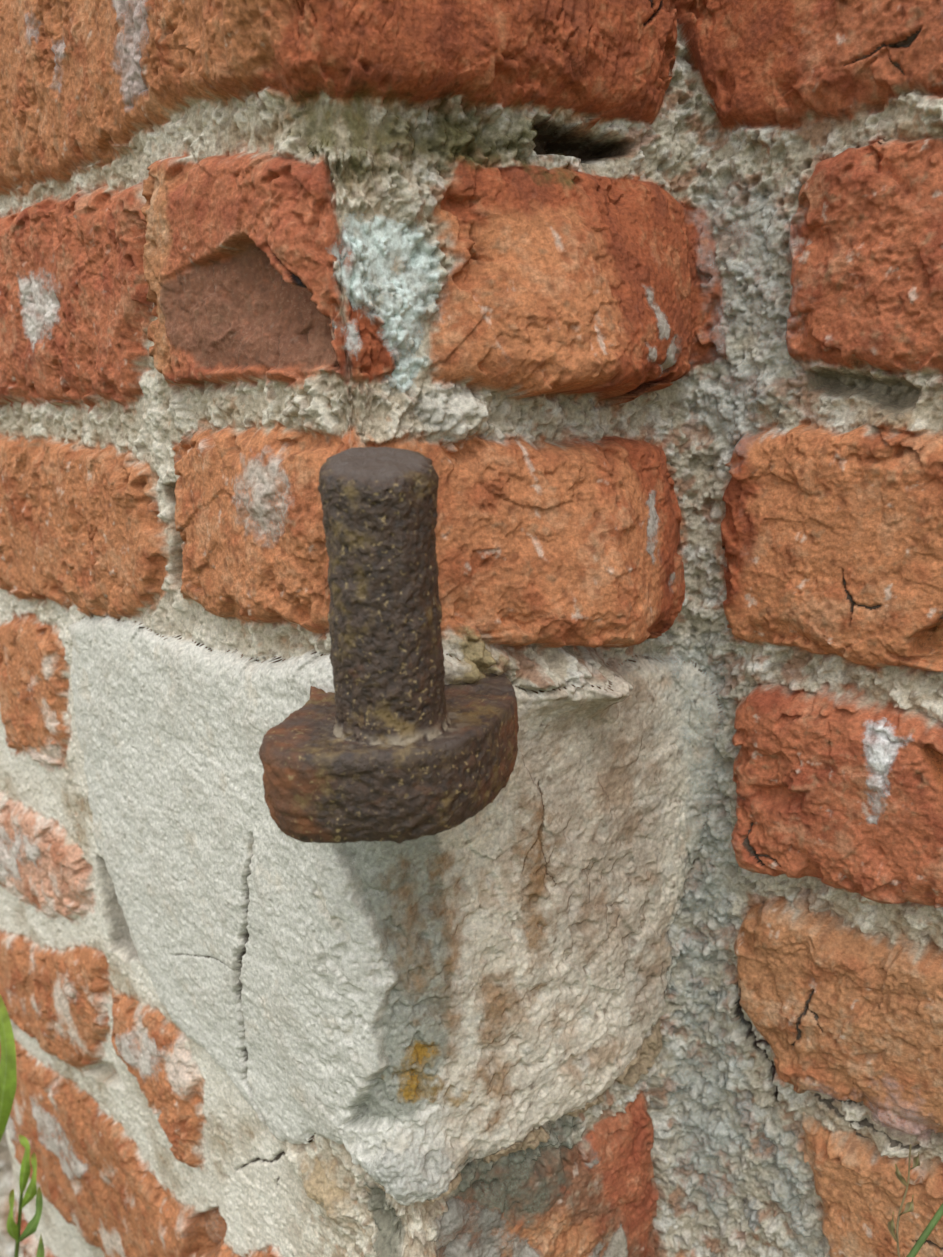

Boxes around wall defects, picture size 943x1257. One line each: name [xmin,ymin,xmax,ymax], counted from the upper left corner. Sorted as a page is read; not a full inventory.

crack [643,0,663,26]
crack [523,781,556,884]
crack [172,907,249,995]